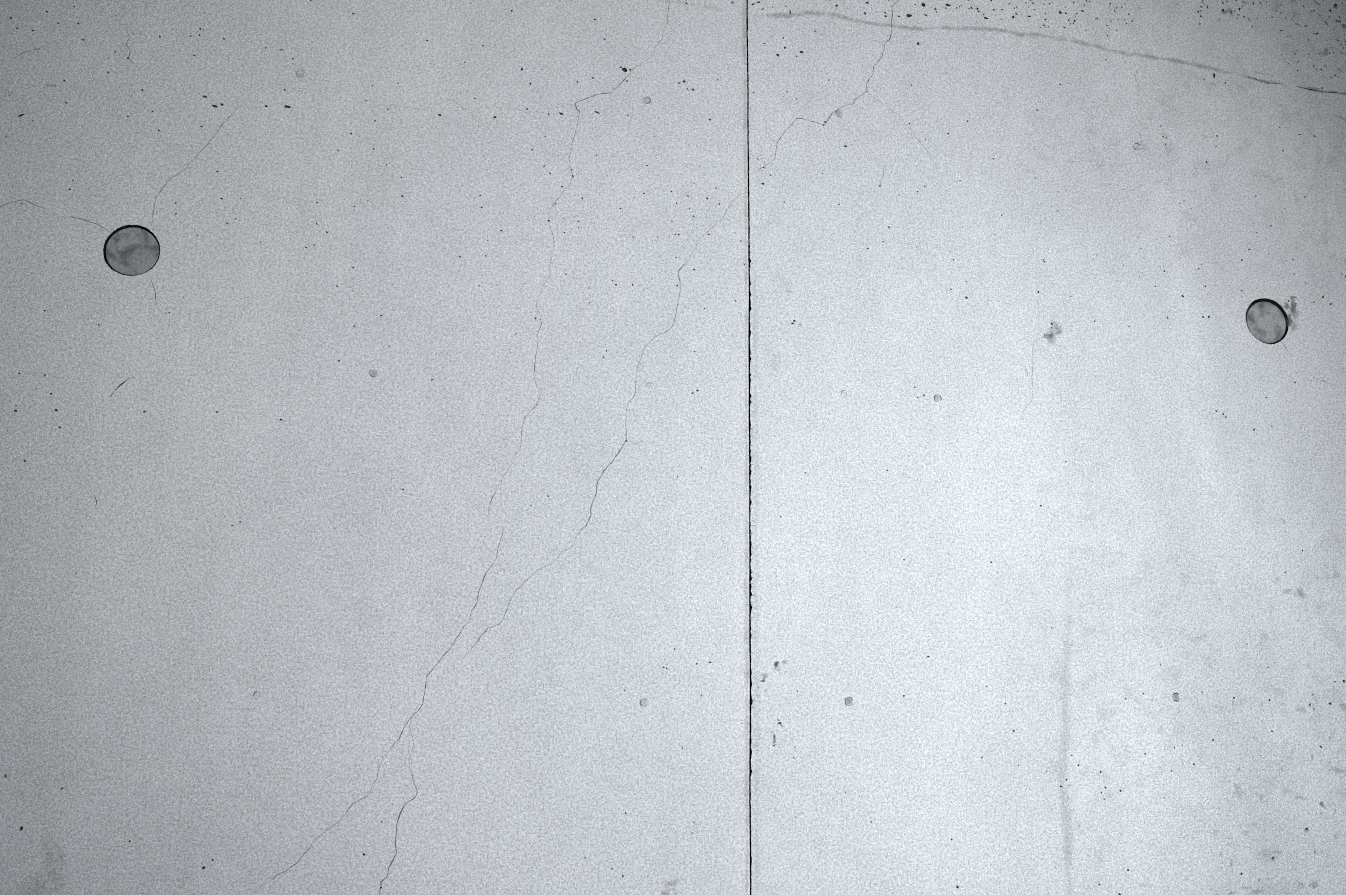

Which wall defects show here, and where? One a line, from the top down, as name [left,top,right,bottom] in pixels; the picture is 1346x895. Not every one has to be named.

crack [251,0,933,894]
crack [1244,76,1342,94]